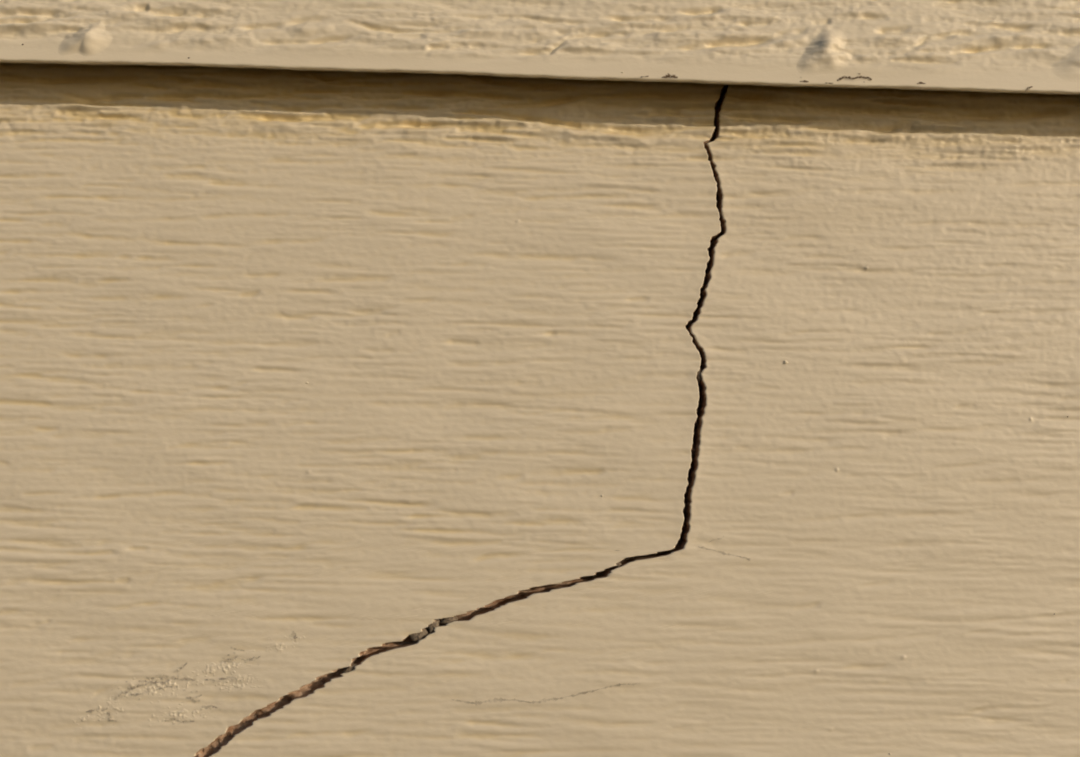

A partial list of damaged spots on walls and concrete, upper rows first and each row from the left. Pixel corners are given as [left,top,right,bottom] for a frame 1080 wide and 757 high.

crack [194,85,729,757]